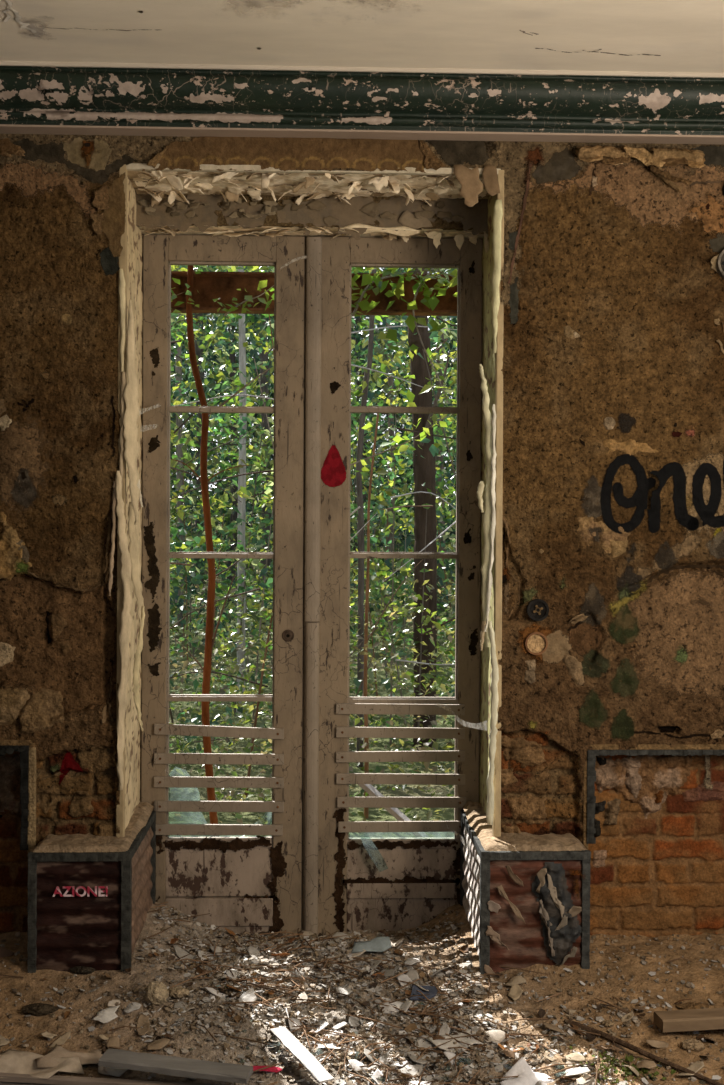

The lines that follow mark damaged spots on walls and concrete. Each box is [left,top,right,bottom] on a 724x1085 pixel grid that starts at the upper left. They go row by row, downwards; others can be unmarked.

crack [520,30,661,56]
peeling [0,73,283,123]
peeling [341,116,392,125]
peeling [469,89,501,98]
peeling [626,89,682,114]
peeling [699,93,724,108]
peeling [0,137,724,353]
spalling [603,417,659,456]
peeling [577,453,724,584]
spalling [0,247,145,842]
flaking render [477,364,583,837]
spalling [524,613,604,687]